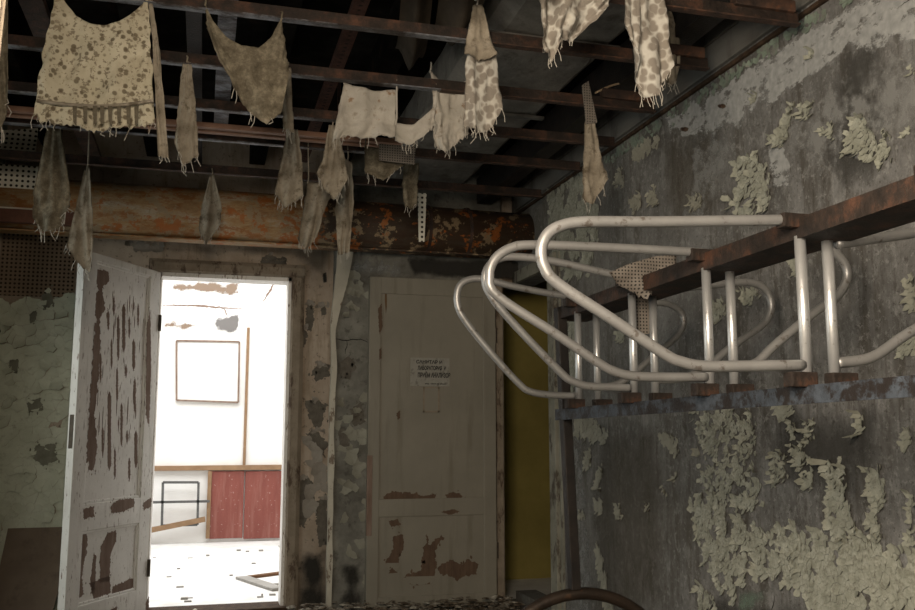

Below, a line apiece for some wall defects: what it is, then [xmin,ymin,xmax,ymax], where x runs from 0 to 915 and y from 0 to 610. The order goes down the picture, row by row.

peeling [604,8,826,215]
peeling [813,112,910,172]
spalling [303,299,330,347]
peeling [0,285,76,562]
peeling [299,356,367,547]
peeling [573,418,624,521]
peeling [658,432,679,459]
peeling [687,405,915,610]
peeling [593,541,607,590]